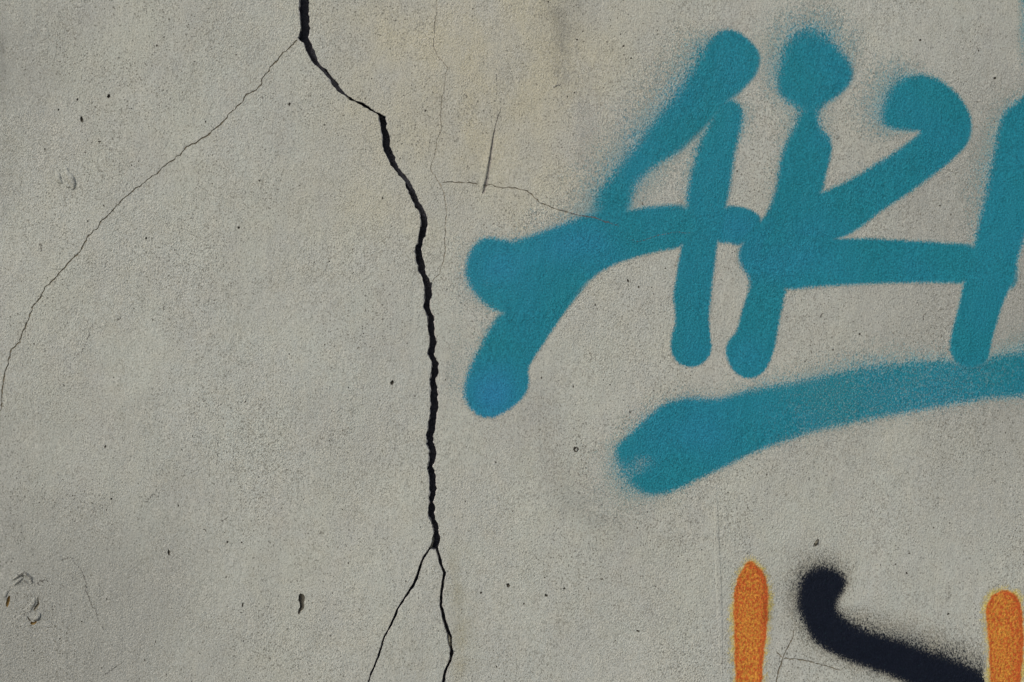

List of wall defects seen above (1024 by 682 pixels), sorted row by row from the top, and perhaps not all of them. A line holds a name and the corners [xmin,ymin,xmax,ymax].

crack [0,0,616,682]